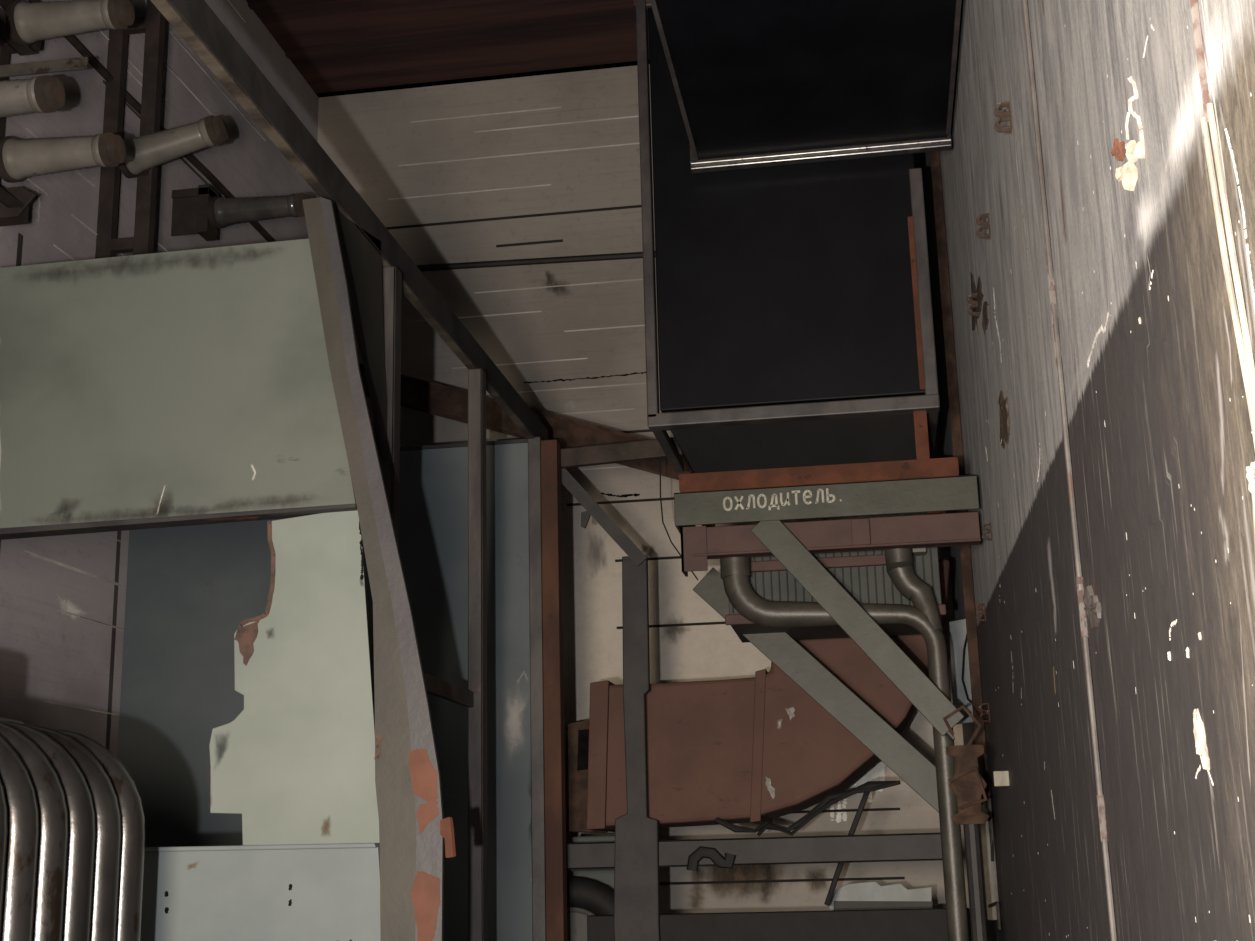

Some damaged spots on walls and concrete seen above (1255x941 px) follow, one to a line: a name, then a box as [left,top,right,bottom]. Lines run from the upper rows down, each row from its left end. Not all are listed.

peeling [1111,76,1145,191]
spalling [1246,462,1255,492]
peeling [1193,709,1214,786]